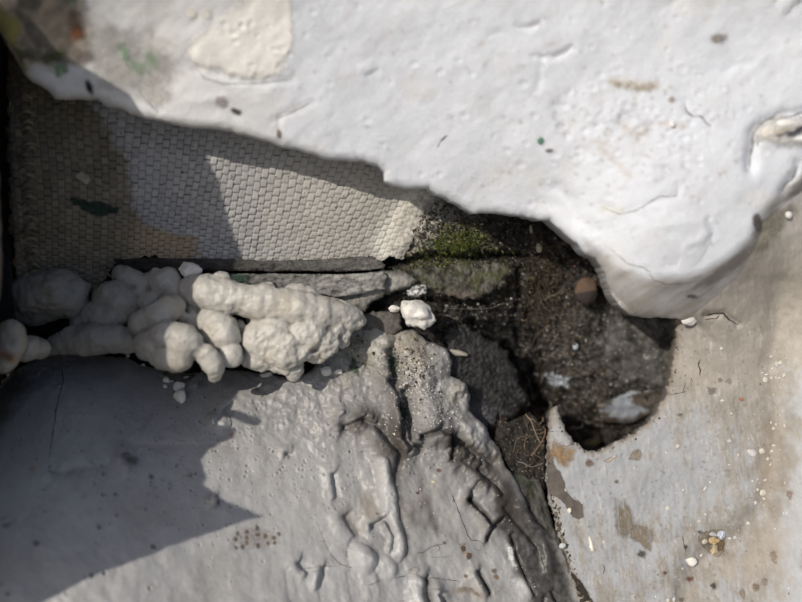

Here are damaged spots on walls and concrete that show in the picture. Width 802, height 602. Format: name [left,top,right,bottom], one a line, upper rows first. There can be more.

flaking render [187,0,293,80]
spalling [216,97,241,115]
spalling [163,372,195,382]
crack [509,515,556,602]